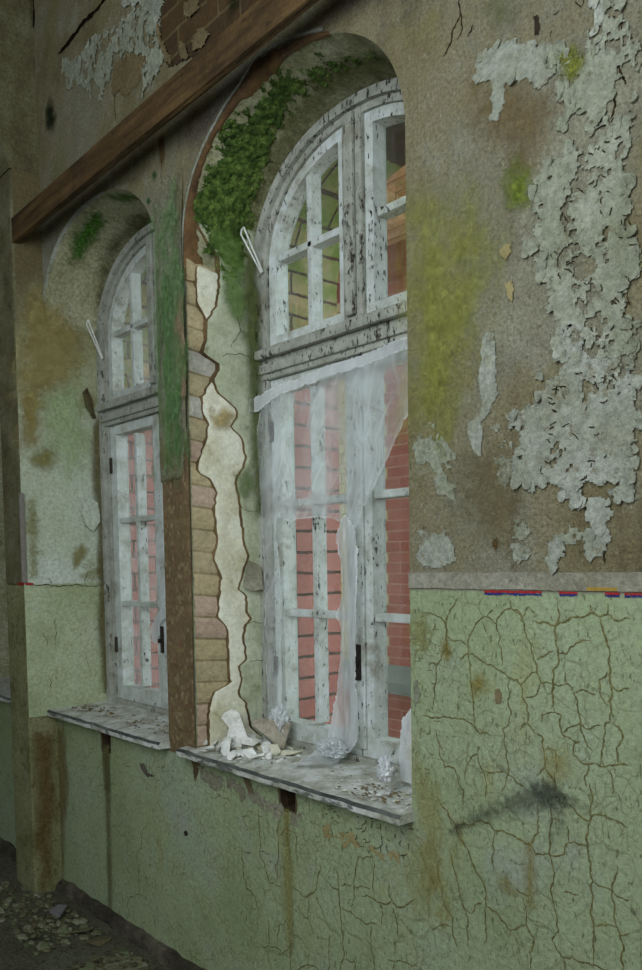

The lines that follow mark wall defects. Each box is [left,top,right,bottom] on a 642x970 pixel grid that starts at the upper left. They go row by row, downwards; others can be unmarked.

crack [58,0,105,54]
flaking render [62,0,258,101]
peeling [467,0,642,575]
flaking render [162,26,330,753]
peeling [412,422,458,507]
peeling [416,530,456,568]
crack [203,597,630,970]